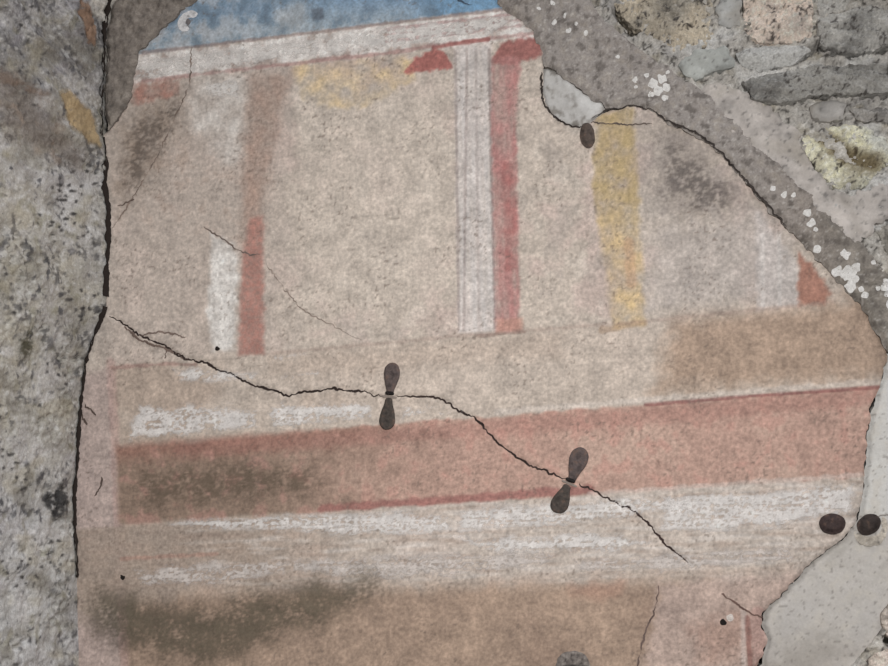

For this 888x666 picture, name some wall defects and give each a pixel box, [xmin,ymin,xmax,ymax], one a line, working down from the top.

crack [72,0,691,577]
water stain [102,585,363,657]
crack [637,585,659,666]